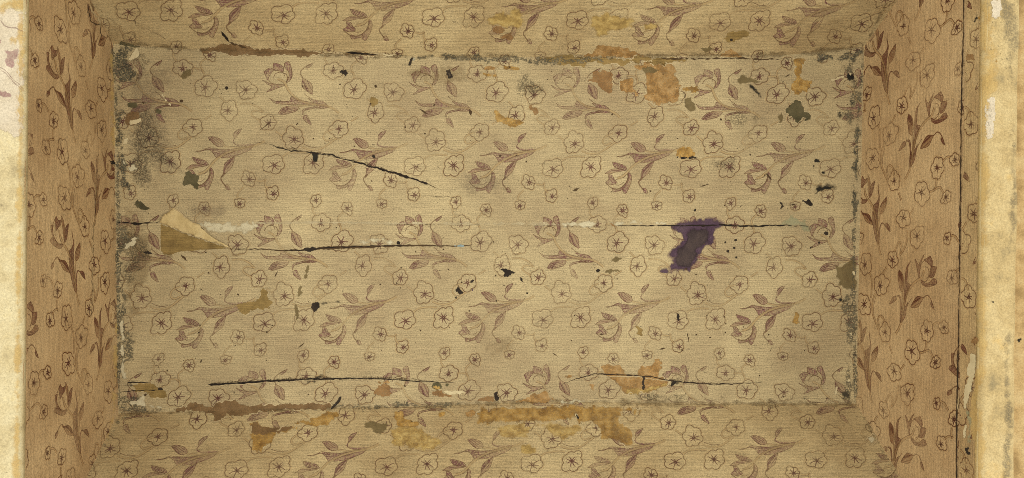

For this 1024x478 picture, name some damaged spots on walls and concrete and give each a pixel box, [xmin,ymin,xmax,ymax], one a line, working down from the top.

damp [115,46,136,96]
damp [117,110,130,190]
crack [261,142,454,198]
peeling [159,208,232,249]
crack [236,244,470,252]
crack [208,376,452,386]
crack [565,373,761,385]
damp [335,401,459,434]